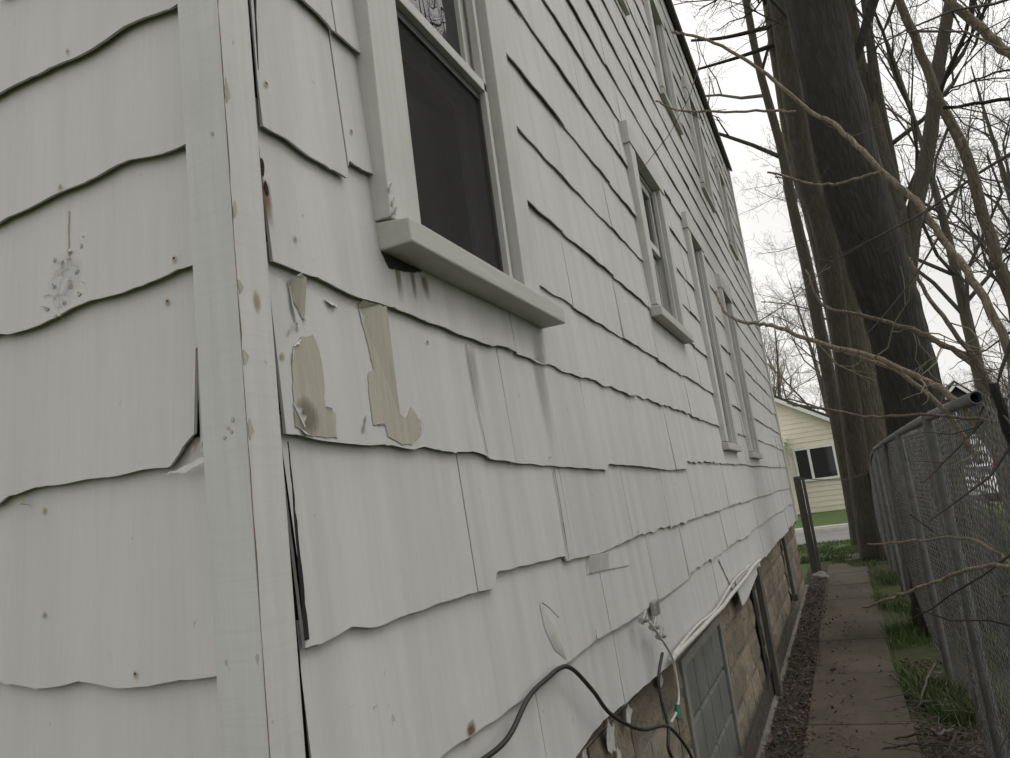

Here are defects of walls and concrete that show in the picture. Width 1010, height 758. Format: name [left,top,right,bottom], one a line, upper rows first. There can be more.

peeling [287,272,338,439]
peeling [358,300,424,445]